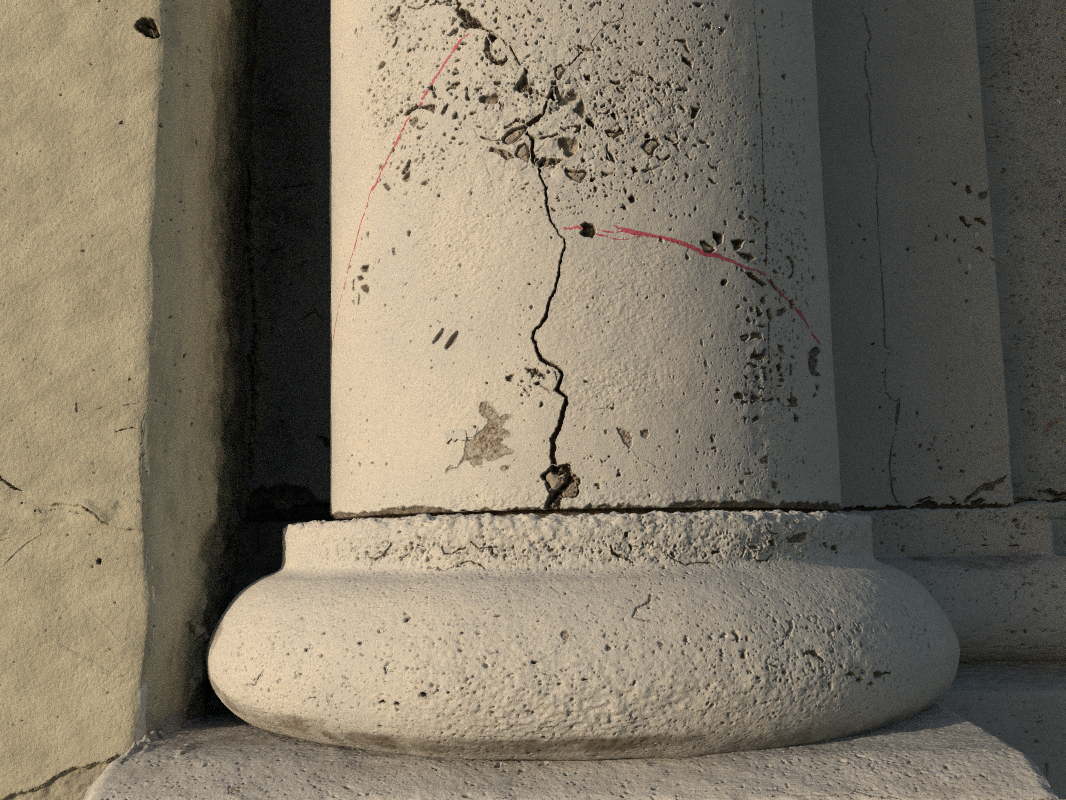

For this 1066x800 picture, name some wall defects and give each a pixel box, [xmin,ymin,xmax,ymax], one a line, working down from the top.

spalling [388,0,509,67]
crack [484,26,522,67]
spalling [401,80,470,130]
spalling [382,159,411,192]
crack [524,0,625,467]
crack [860,0,901,505]
spalling [351,264,370,306]
spalling [431,327,459,351]
spalling [504,366,551,395]
peeling [444,399,515,475]
crack [0,474,109,526]
spalling [540,462,583,509]